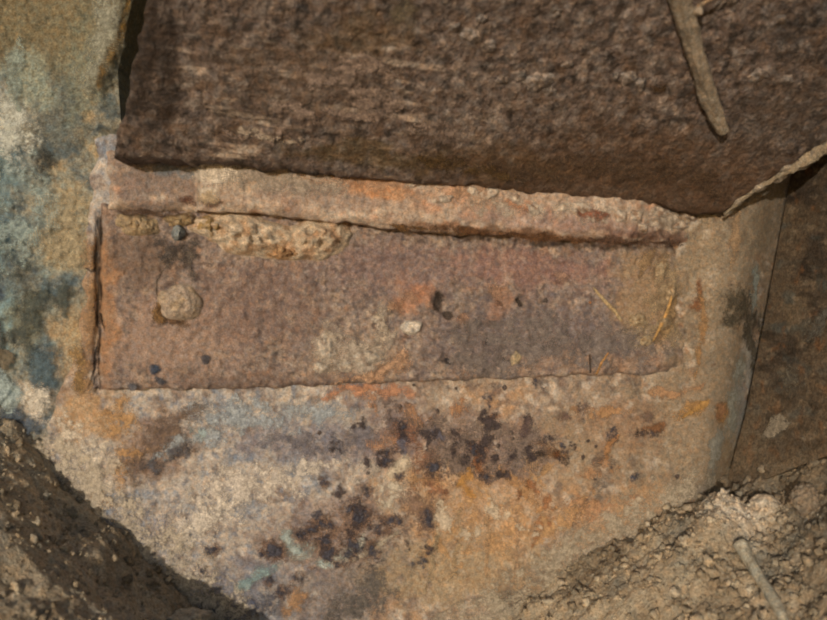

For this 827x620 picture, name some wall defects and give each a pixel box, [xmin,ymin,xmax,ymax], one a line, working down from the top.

crack [86,211,104,388]
corrosion [648,279,729,423]
damp [434,498,482,543]
corrosion [321,348,632,594]
corrosion [635,412,665,438]